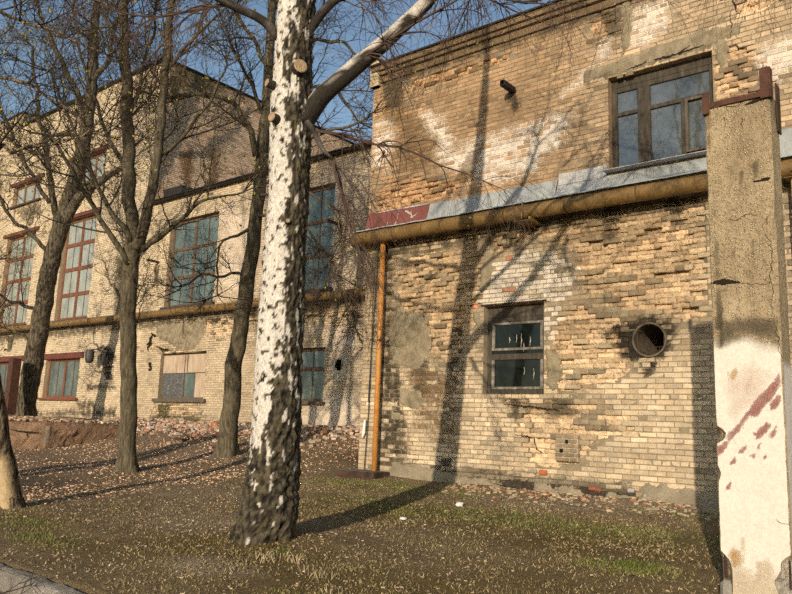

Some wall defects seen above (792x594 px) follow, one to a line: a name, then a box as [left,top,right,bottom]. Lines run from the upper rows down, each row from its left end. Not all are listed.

spalling [579,7,623,47]
spalling [737,0,783,14]
spalling [713,47,775,106]
leakage [372,80,402,173]
leakage [418,109,573,187]
leakage [666,197,683,226]
crack [724,214,784,359]
leakage [377,232,475,466]
spalling [387,206,741,498]
leakage [639,362,657,377]
spalling [775,556,792,594]